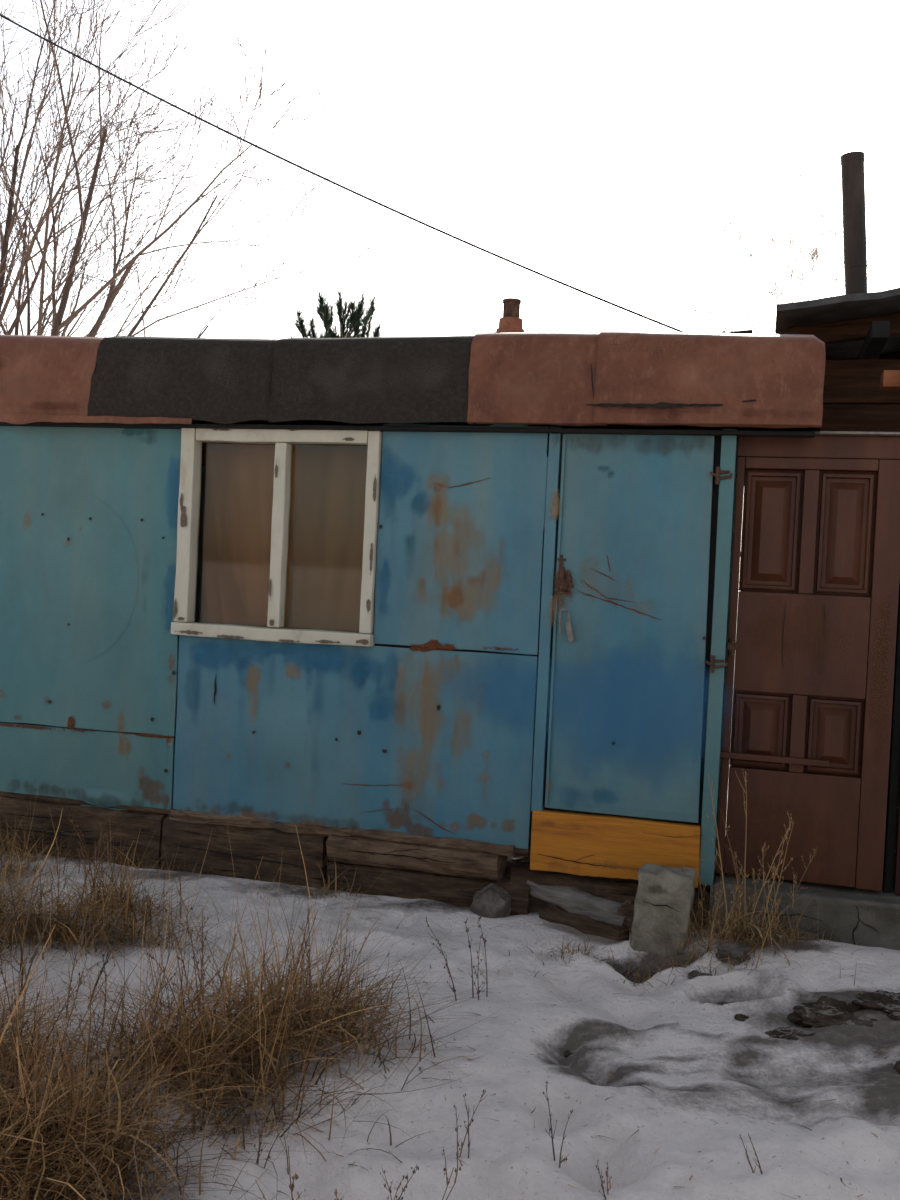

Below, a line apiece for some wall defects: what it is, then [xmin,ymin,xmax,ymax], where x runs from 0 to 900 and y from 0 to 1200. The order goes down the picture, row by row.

corrosion [410,640,455,652]
corrosion [0,716,95,731]
corrosion [119,717,171,749]